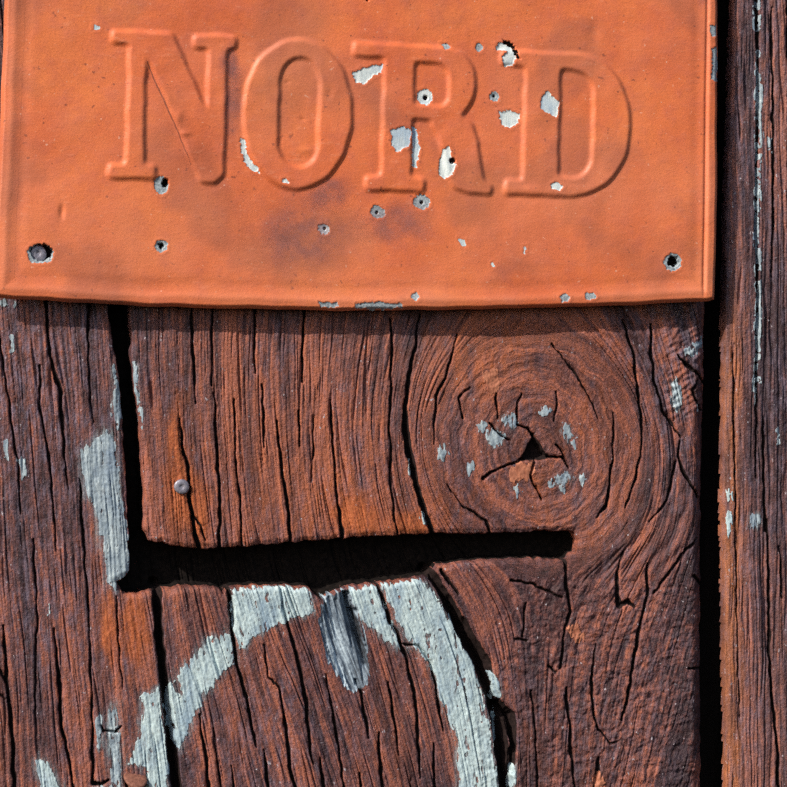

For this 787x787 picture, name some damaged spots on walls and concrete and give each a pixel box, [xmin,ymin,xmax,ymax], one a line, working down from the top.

peeling [352,64,383,84]
peeling [390,126,421,168]
peeling [439,146,456,179]
peeling [499,110,520,128]
peeling [541,91,559,117]
crack [32,300,123,787]
peeling [80,364,129,591]
crack [179,308,243,549]
crack [253,309,345,544]
crack [388,313,435,536]
crack [551,320,697,522]
crack [615,538,696,721]